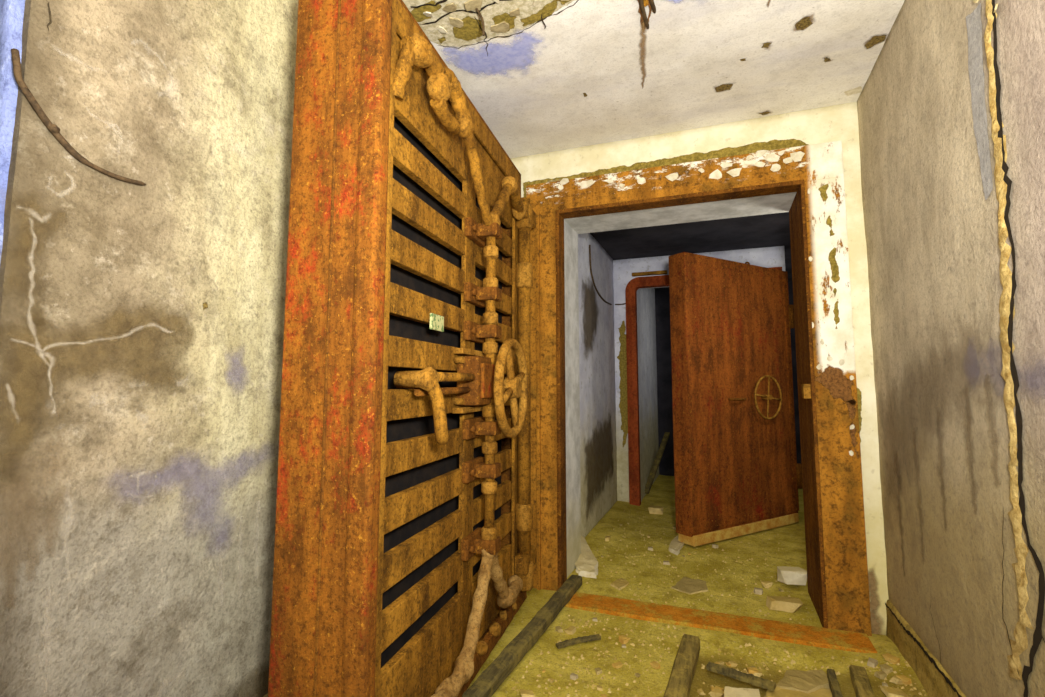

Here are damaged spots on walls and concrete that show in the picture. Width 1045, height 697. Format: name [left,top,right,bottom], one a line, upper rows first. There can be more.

spalling [402,0,578,56]
peeling [523,139,808,197]
peeling [808,184,829,202]
peeling [811,216,840,329]
crack [984,0,1045,697]
peeling [815,339,862,458]
corrosion [868,570,882,635]
crack [885,603,962,697]